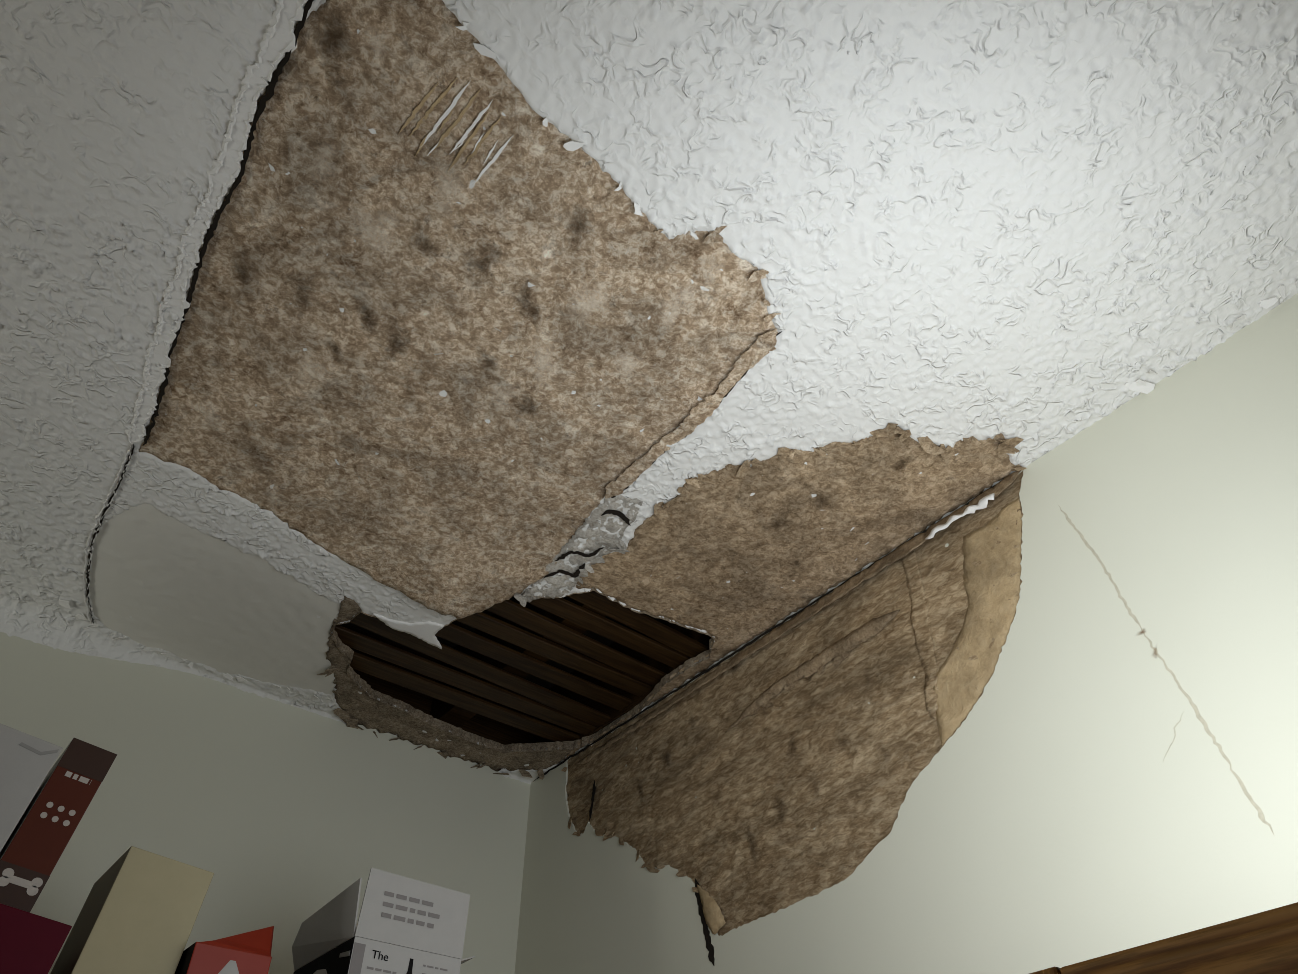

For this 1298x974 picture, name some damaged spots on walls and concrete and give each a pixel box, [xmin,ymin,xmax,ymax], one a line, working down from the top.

crack [82,0,314,624]
peeling [55,0,1027,936]
crack [1058,505,1274,834]